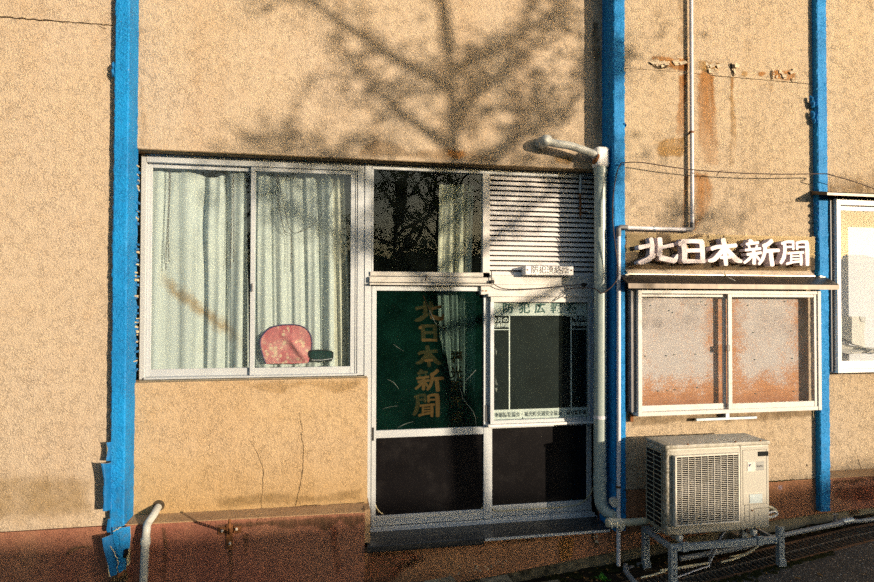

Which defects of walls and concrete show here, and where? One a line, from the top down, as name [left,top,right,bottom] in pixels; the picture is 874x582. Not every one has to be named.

crack [0,16,113,29]
flaking render [649,59,688,69]
corrosion [653,57,688,91]
corrosion [699,61,717,122]
flaking render [770,68,797,81]
peeling [101,442,131,577]